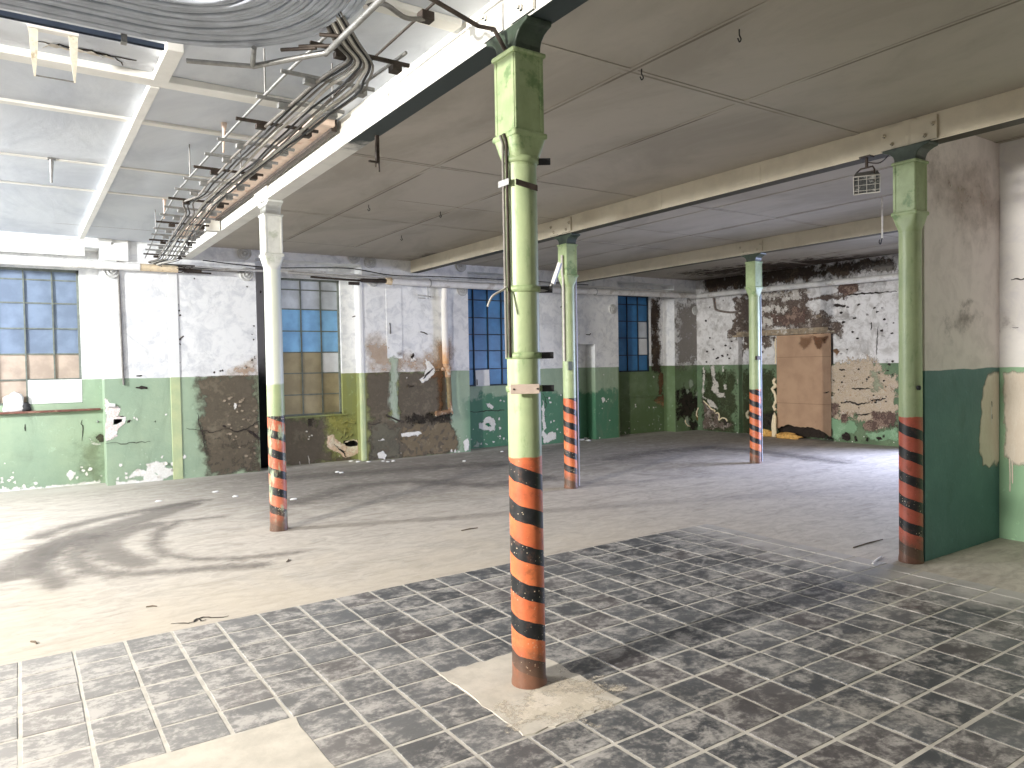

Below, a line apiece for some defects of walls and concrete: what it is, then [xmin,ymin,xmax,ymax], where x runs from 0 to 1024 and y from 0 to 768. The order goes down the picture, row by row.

flaking render [104,398,150,444]
peeling [116,455,186,485]
flaking render [327,421,395,473]
corrosion [430,345,450,411]
flaking render [696,337,738,430]
leakage [674,256,897,439]
flaking render [827,349,898,443]